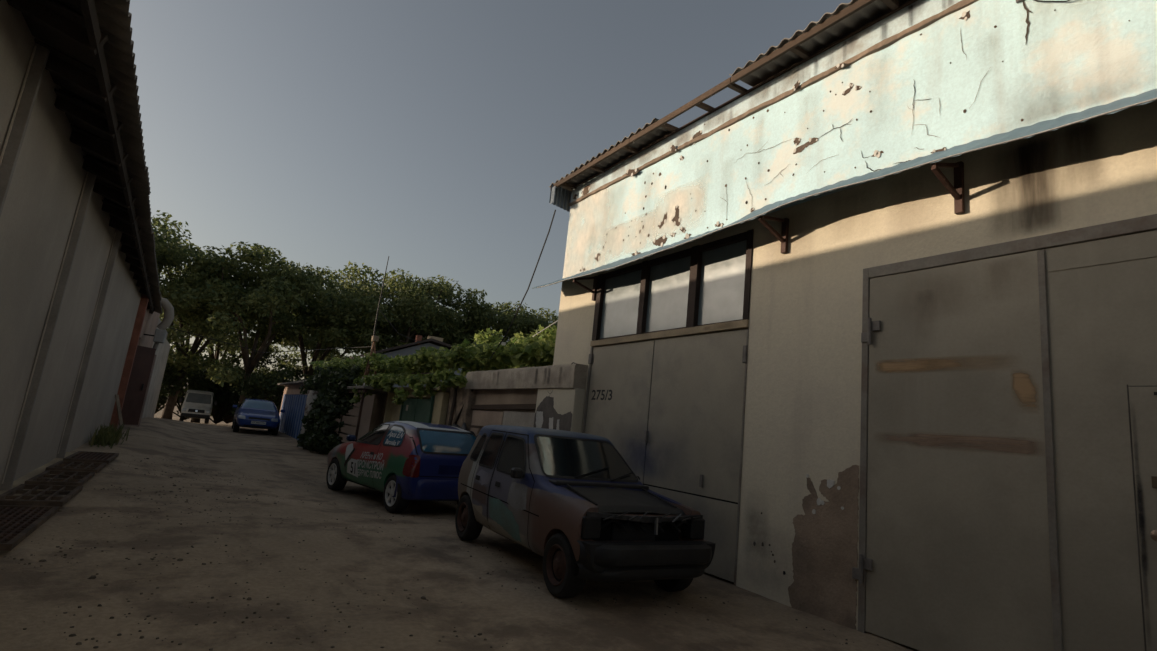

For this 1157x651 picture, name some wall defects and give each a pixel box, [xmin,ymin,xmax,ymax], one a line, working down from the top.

spalling [792,128,818,176]
crack [720,81,940,219]
peeling [580,168,691,272]
rust [885,433,1035,454]
spalling [753,465,860,630]